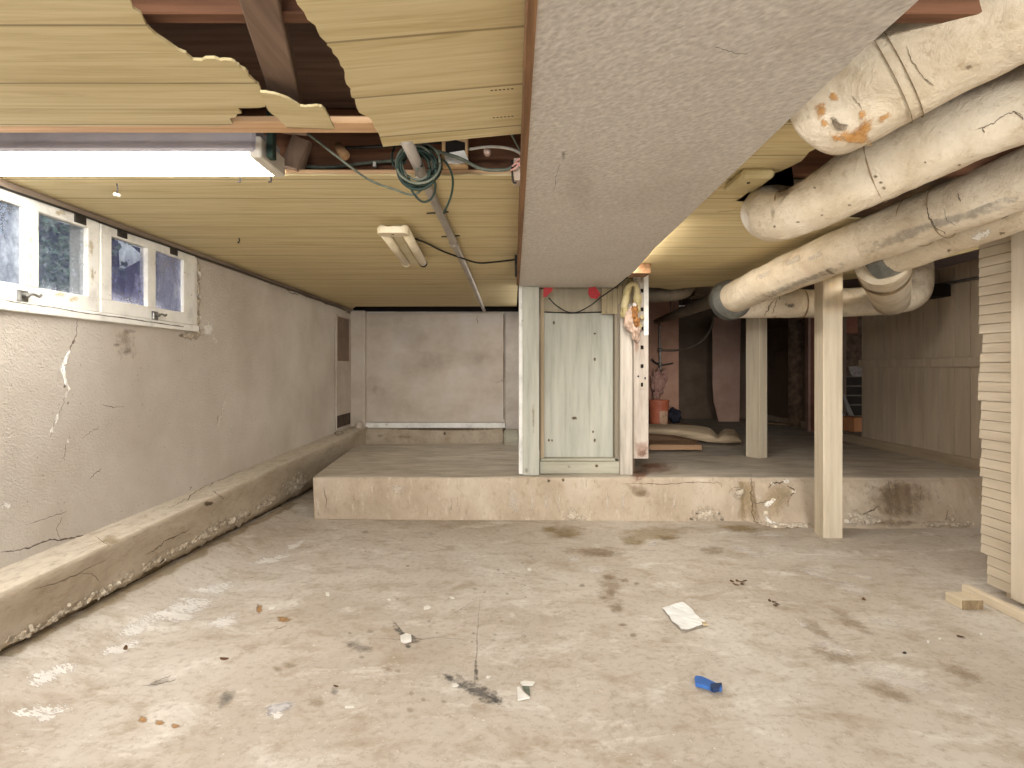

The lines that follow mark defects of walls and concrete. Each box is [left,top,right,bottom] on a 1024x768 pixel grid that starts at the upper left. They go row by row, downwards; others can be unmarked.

corrosion [816,93,838,126]
corrosion [832,111,889,144]
crack [978,111,1024,132]
crack [50,320,112,458]
crack [169,471,240,508]
peeling [760,479,810,528]
crack [5,512,83,552]
crack [36,561,104,589]
spalling [6,470,309,644]